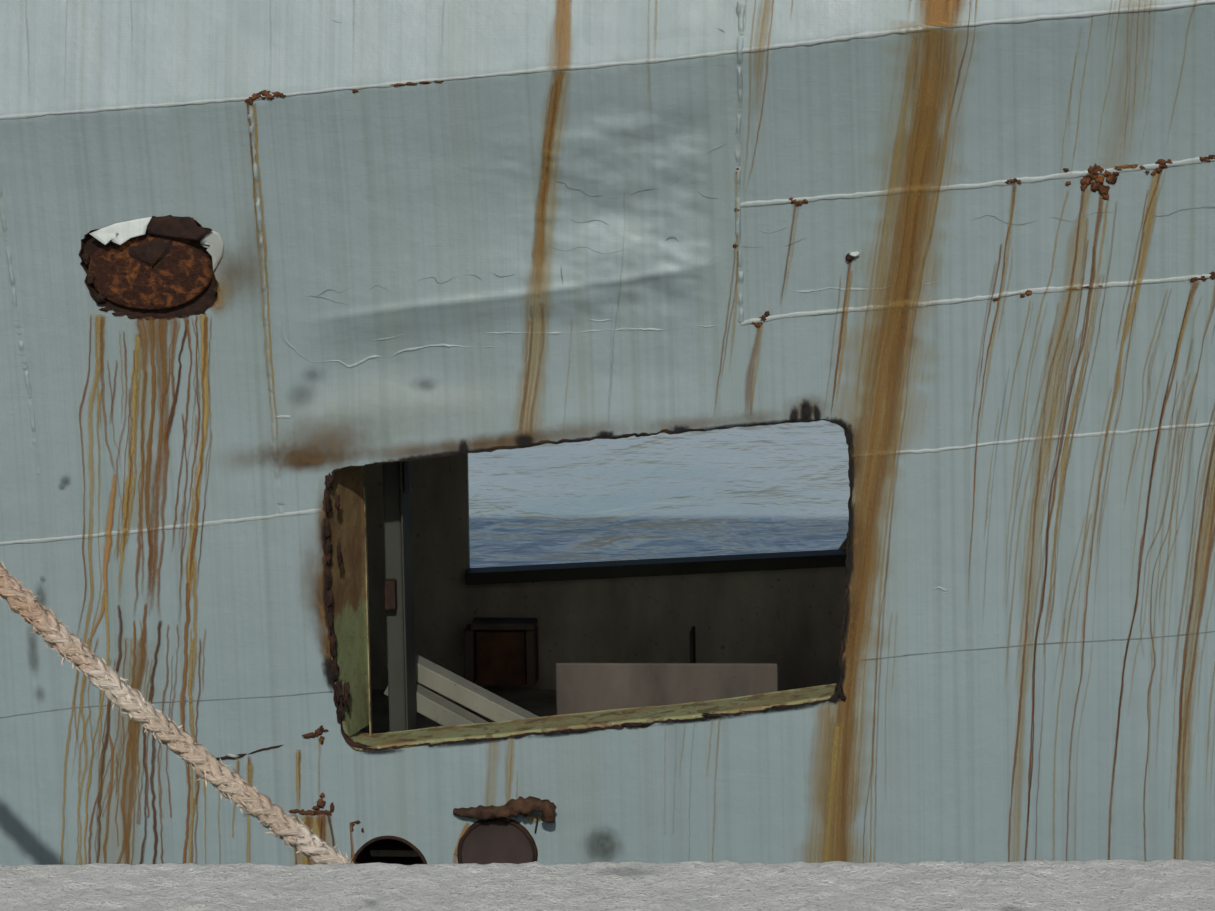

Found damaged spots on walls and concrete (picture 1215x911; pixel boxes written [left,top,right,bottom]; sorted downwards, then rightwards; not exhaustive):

corrosion [79,314,209,743]
corrosion [245,90,286,412]
corrosion [520,0,570,448]
corrosion [783,197,808,287]
corrosion [820,0,970,862]
corrosion [970,178,1021,547]
corrosion [1008,159,1173,862]
corrosion [1108,271,1215,860]
corrosion [60,667,252,865]
corrosion [294,848,314,865]
corrosion [289,725,334,847]